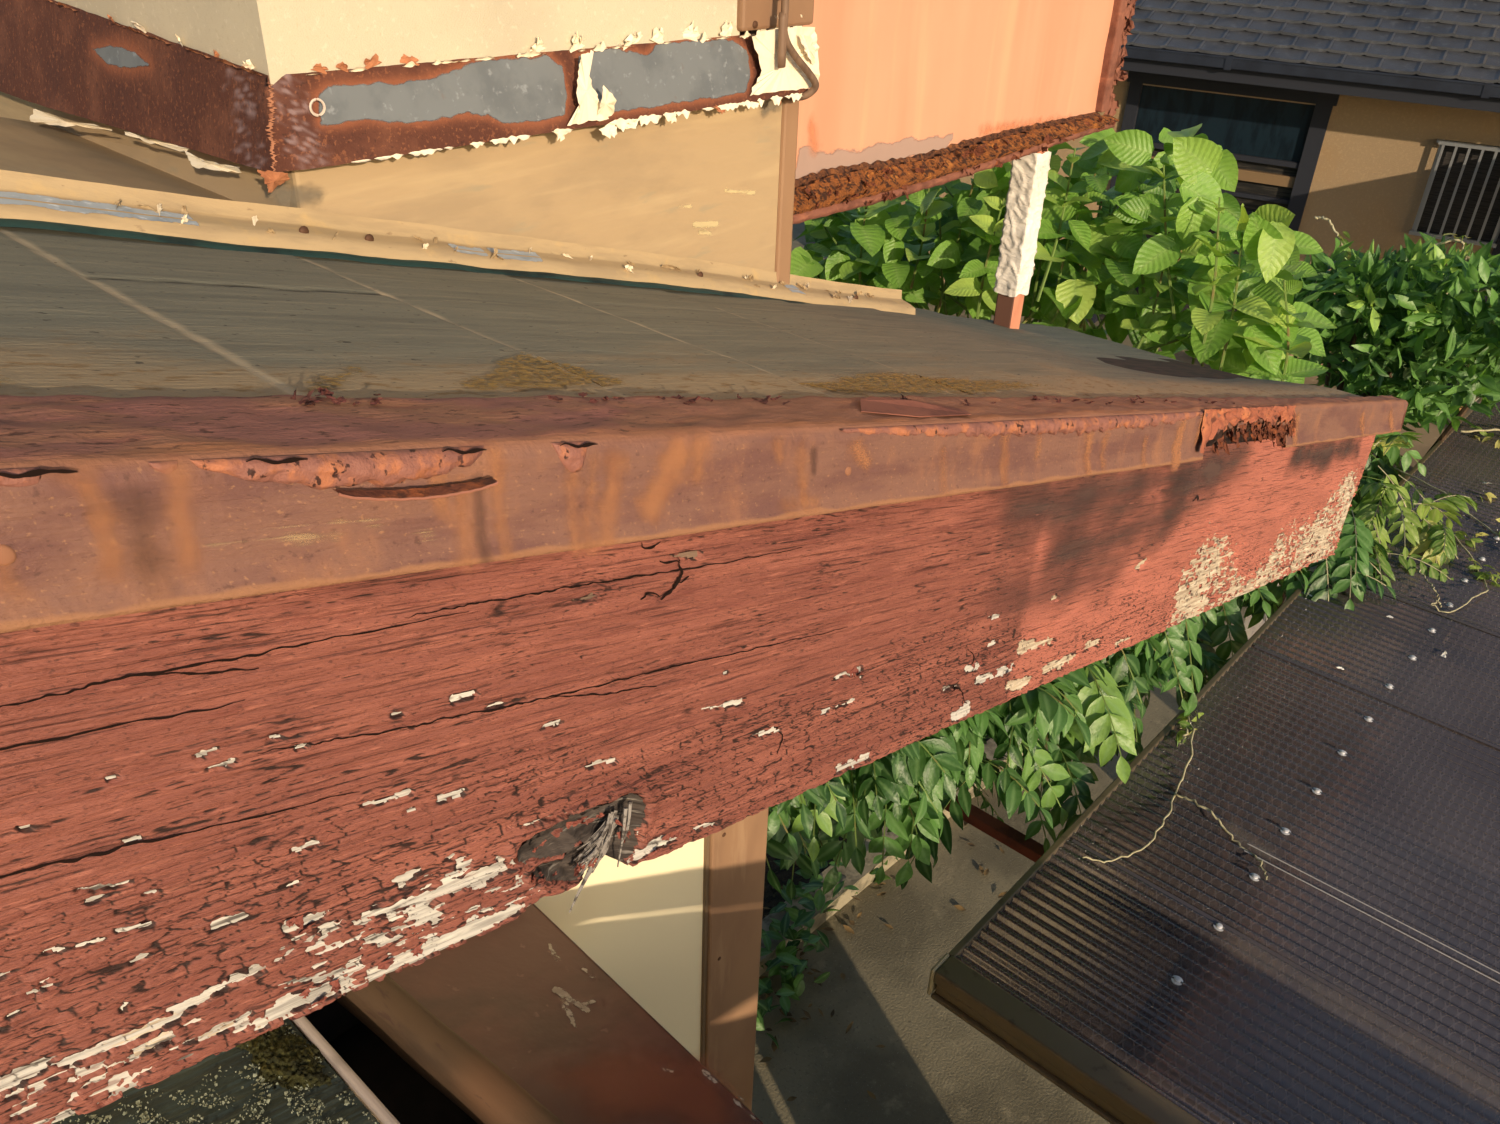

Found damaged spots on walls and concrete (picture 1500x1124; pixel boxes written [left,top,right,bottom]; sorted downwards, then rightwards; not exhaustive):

rust [266,82,277,171]
peeling [308,14,820,163]
rust [793,115,1120,215]
peeling [1166,471,1358,629]
crack [0,541,846,754]
peeling [834,665,864,679]
peeling [942,637,1130,721]
peeling [836,752,870,772]
peeling [291,840,319,852]
peeling [523,812,713,863]
peeling [0,853,598,1124]